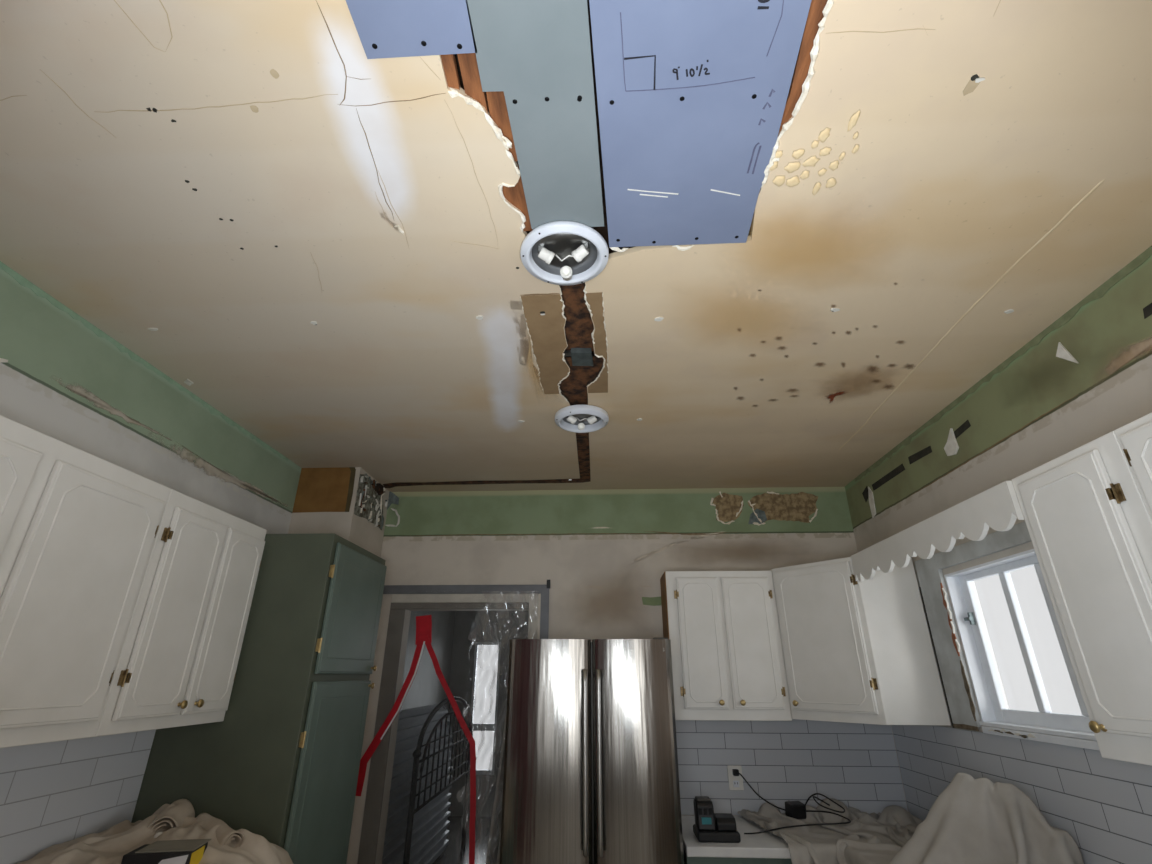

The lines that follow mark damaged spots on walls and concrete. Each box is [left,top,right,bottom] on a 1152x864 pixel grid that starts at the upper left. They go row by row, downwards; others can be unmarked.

crack [833,26,935,35]
crack [0,0,498,249]
peeling [448,88,526,232]
peeling [583,286,605,386]
flaking render [67,385,277,502]
flaking render [710,491,818,526]